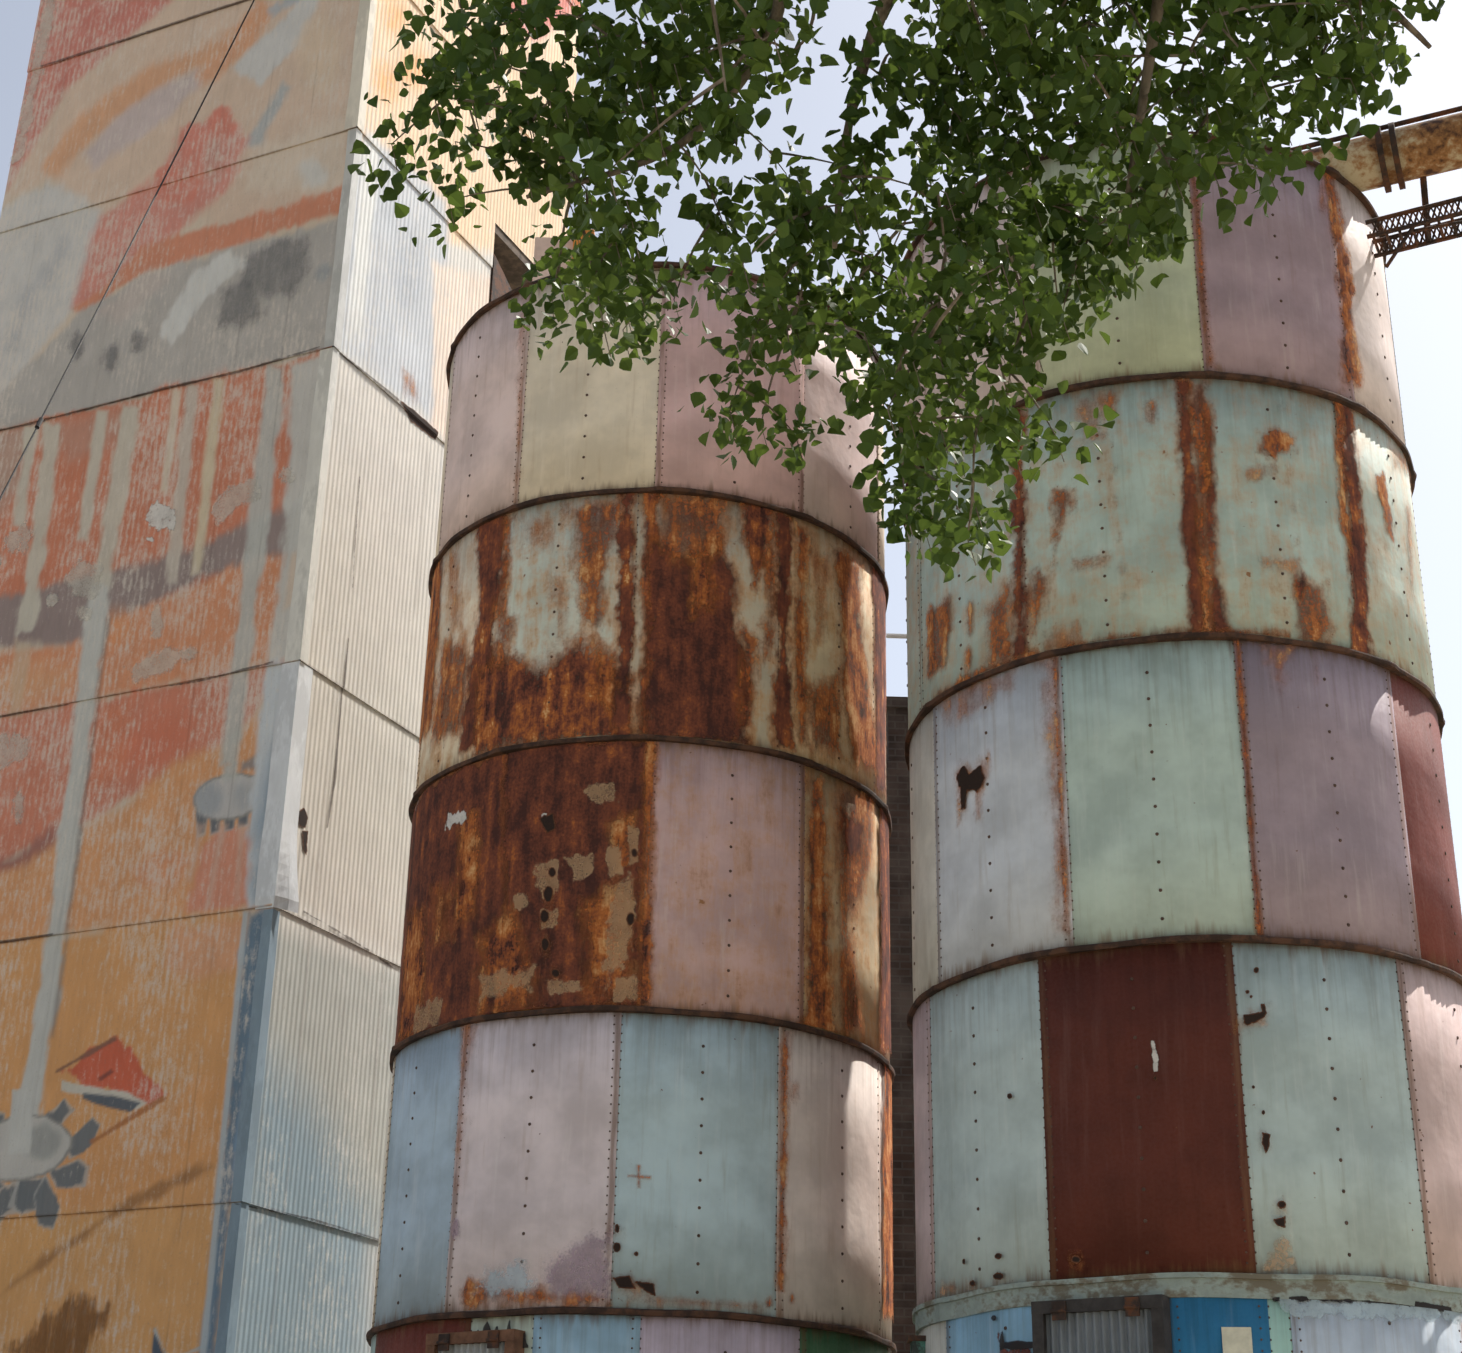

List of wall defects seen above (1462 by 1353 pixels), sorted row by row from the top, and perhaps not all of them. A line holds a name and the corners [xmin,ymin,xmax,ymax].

rust [1193,178,1212,363]
rust [1325,173,1362,387]
rust [926,407,1084,816]
rust [1174,379,1330,935]
rust [1335,402,1412,654]
peeling [445,811,466,830]
rust [395,493,893,1321]
rust [1058,835,1068,915]